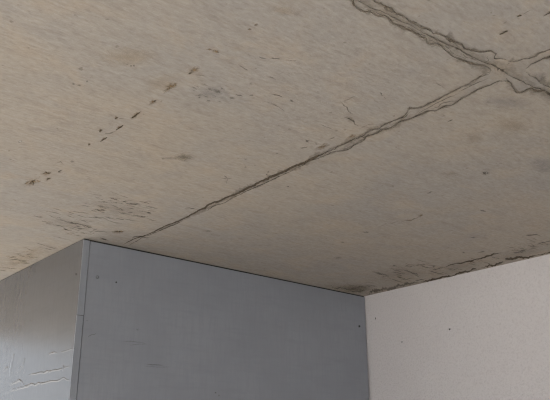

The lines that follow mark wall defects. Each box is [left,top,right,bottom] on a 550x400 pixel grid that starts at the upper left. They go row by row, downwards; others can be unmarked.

crack [125,0,550,245]
crack [435,251,498,270]